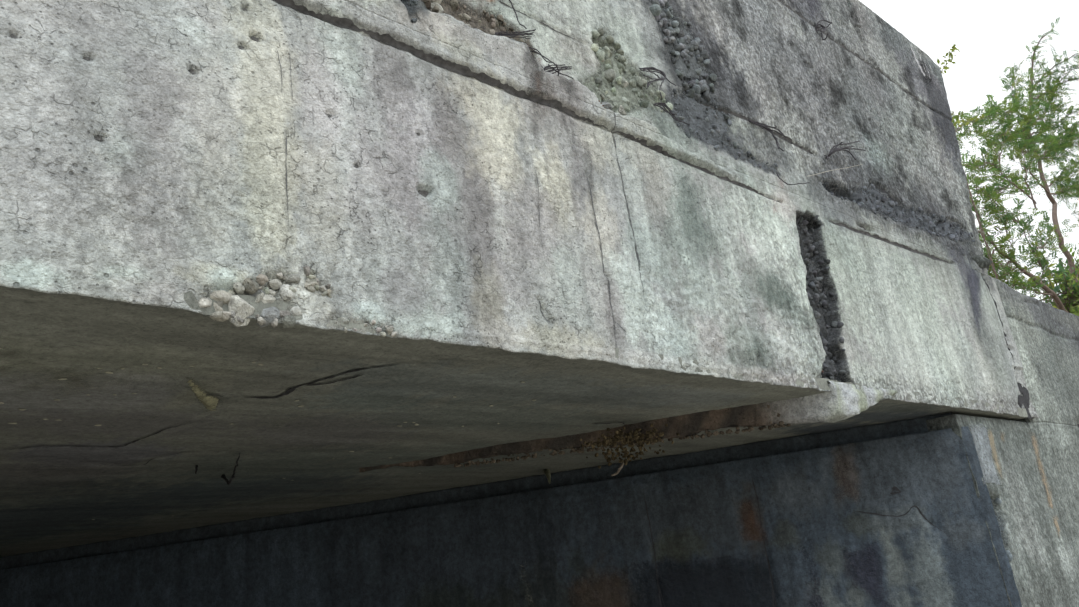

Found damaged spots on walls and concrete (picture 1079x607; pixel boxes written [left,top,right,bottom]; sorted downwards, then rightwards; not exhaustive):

crack [274,0,779,305]
spalling [591,0,779,176]
leakage [911,48,957,150]
spalling [198,265,332,329]
crack [242,364,399,399]
crack [586,174,627,348]
spalling [359,212,898,474]